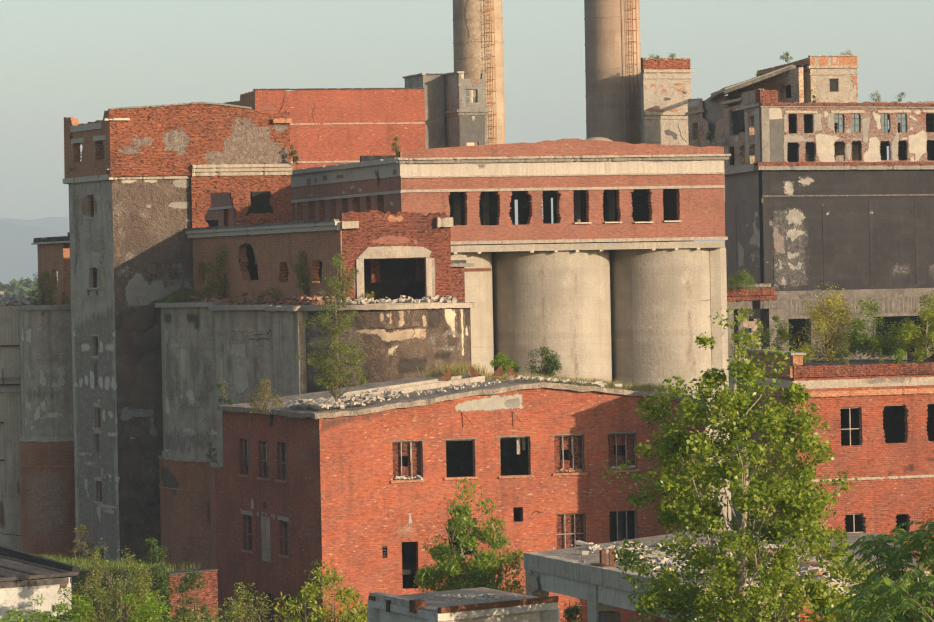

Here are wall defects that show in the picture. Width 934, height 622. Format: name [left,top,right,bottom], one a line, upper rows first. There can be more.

flaking render [118,127,190,155]
flaking render [205,118,289,165]
flaking render [769,107,881,162]
flaking render [891,109,927,162]
peeling [783,175,814,195]
peeling [738,208,808,285]
flaking render [72,330,116,353]
water stain [380,309,410,327]
water stain [445,308,470,356]
flaking render [24,365,118,437]